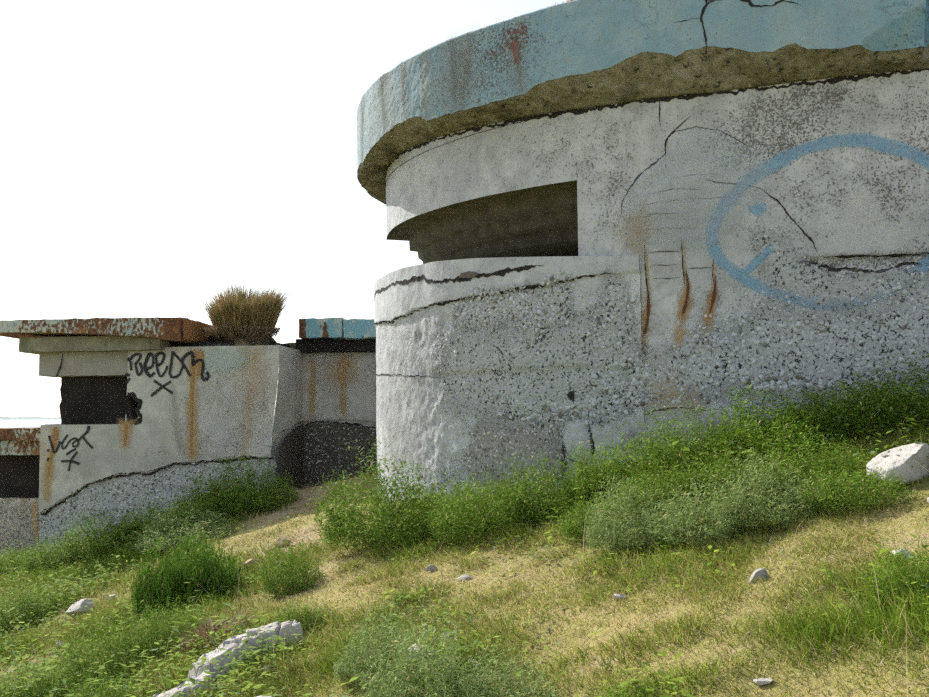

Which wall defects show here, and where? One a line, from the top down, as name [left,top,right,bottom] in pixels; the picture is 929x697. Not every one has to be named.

crack [674,4,708,54]
crack [740,0,800,8]
crack [385,68,929,213]
crack [706,179,929,273]
crack [374,265,611,325]
corrosion [641,246,650,352]
corrosion [675,239,693,348]
corrosion [703,264,717,344]
hole [127,392,143,425]
corrosion [183,319,213,460]
corrosion [32,428,59,540]
spalling [0,458,277,559]